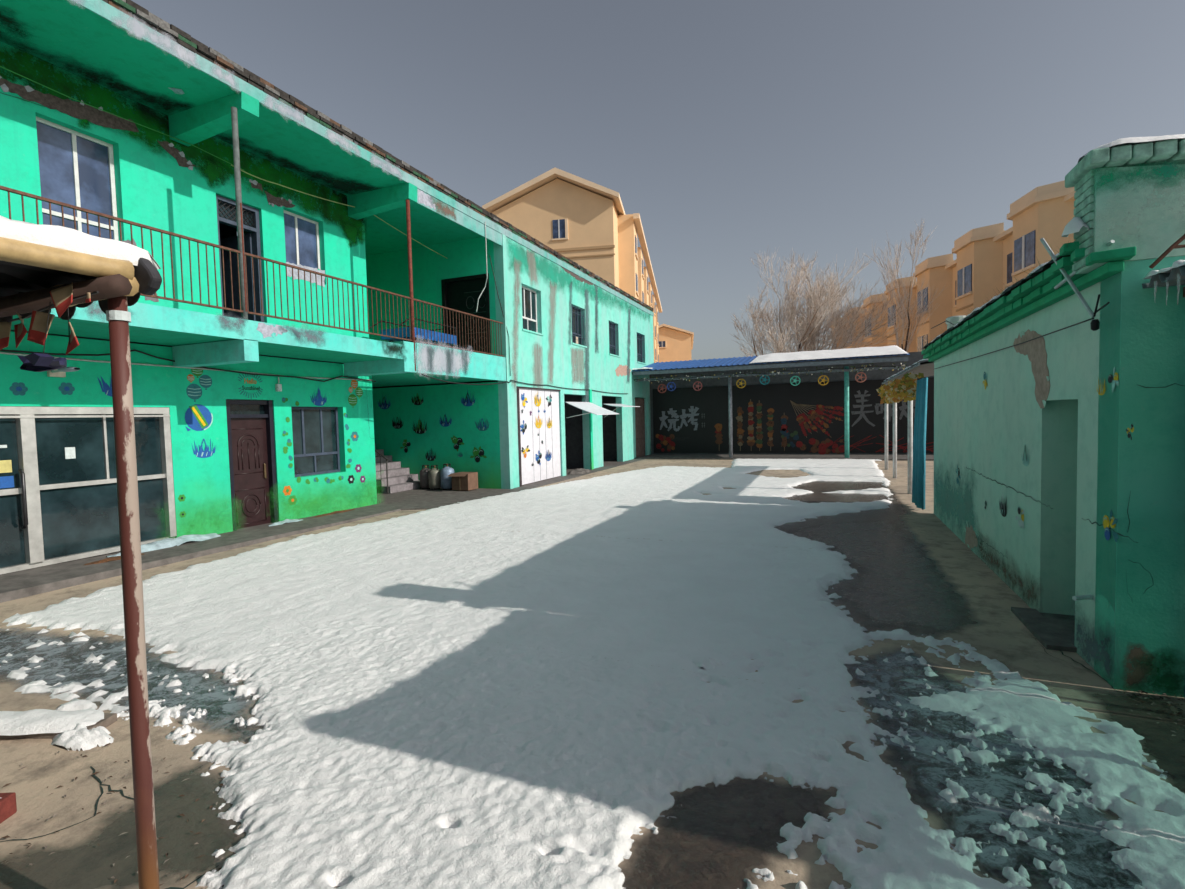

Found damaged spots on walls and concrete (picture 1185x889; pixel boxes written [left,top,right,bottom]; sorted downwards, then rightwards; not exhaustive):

flaking render [0,76,139,132]
flaking render [158,141,198,170]
water stain [0,11,379,246]
water stain [509,243,650,402]